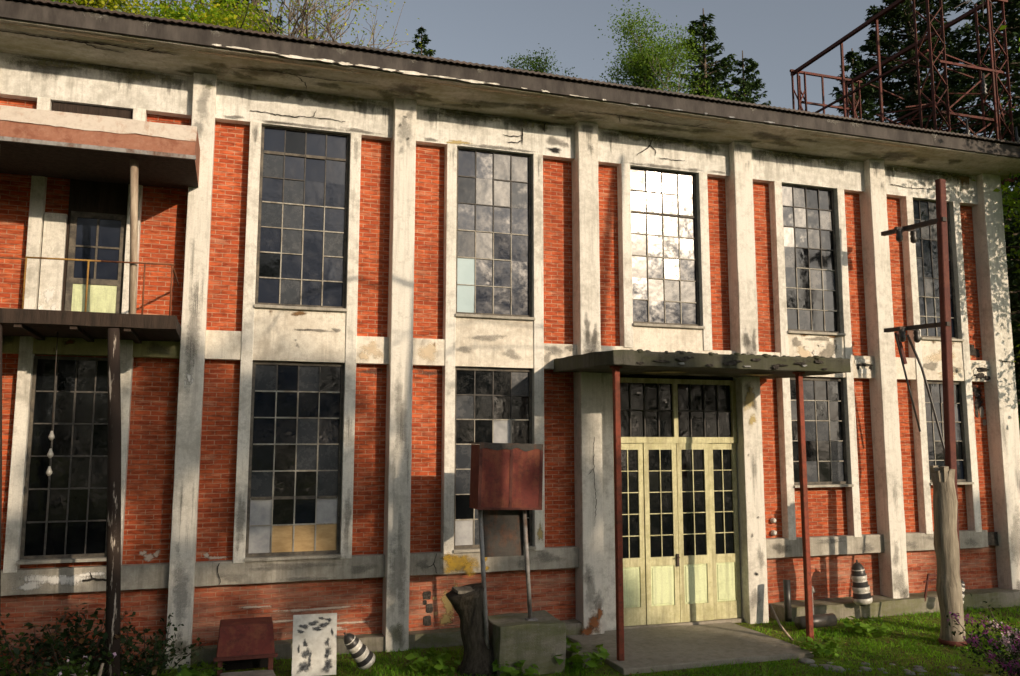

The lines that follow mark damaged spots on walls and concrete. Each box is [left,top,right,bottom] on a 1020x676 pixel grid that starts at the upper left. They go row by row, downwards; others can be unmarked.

crack [0,30,173,55]
damp [17,51,593,153]
damp [605,111,729,155]
damp [737,132,970,187]
spalling [637,336,840,424]
spalling [854,358,874,374]
peeling [12,572,103,590]